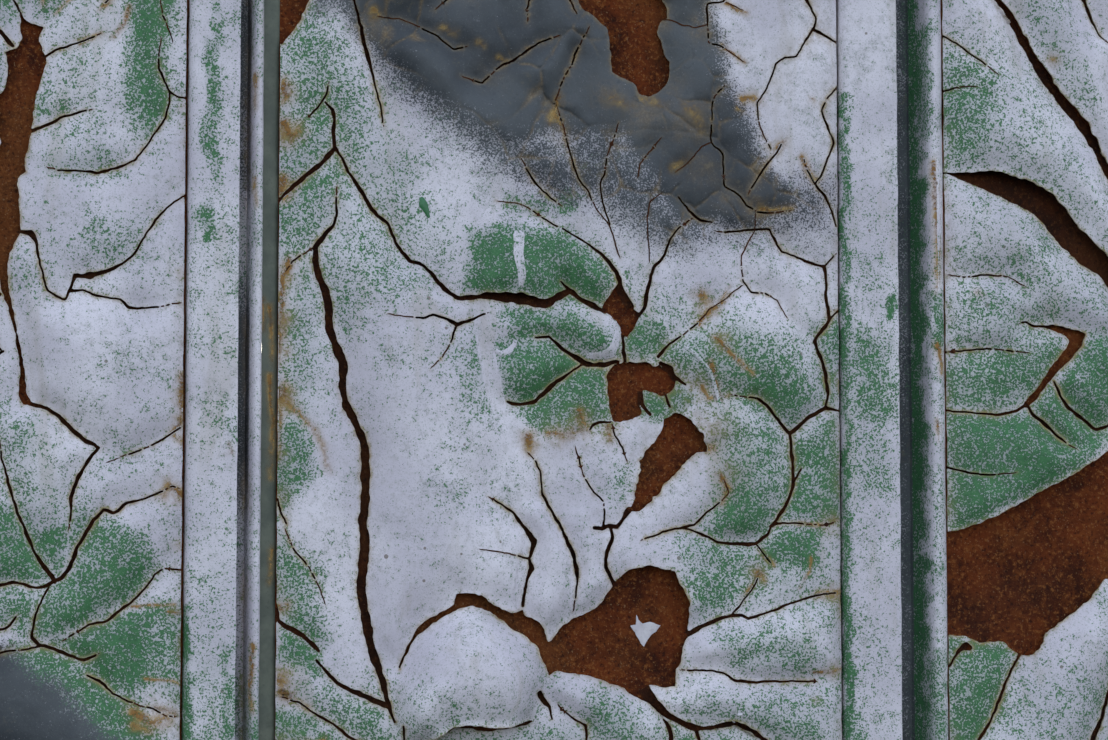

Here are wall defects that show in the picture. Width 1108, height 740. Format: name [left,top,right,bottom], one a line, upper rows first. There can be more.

peeling [0,0,64,417]
crack [31,109,92,133]
crack [20,197,183,310]
crack [43,0,184,174]
peeling [280,0,329,61]
peeling [571,0,688,112]
crack [994,0,1108,179]
crack [276,0,837,740]
peeling [590,266,719,529]
crack [946,382,1108,449]
crack [0,402,181,718]
peeling [946,430,1108,673]